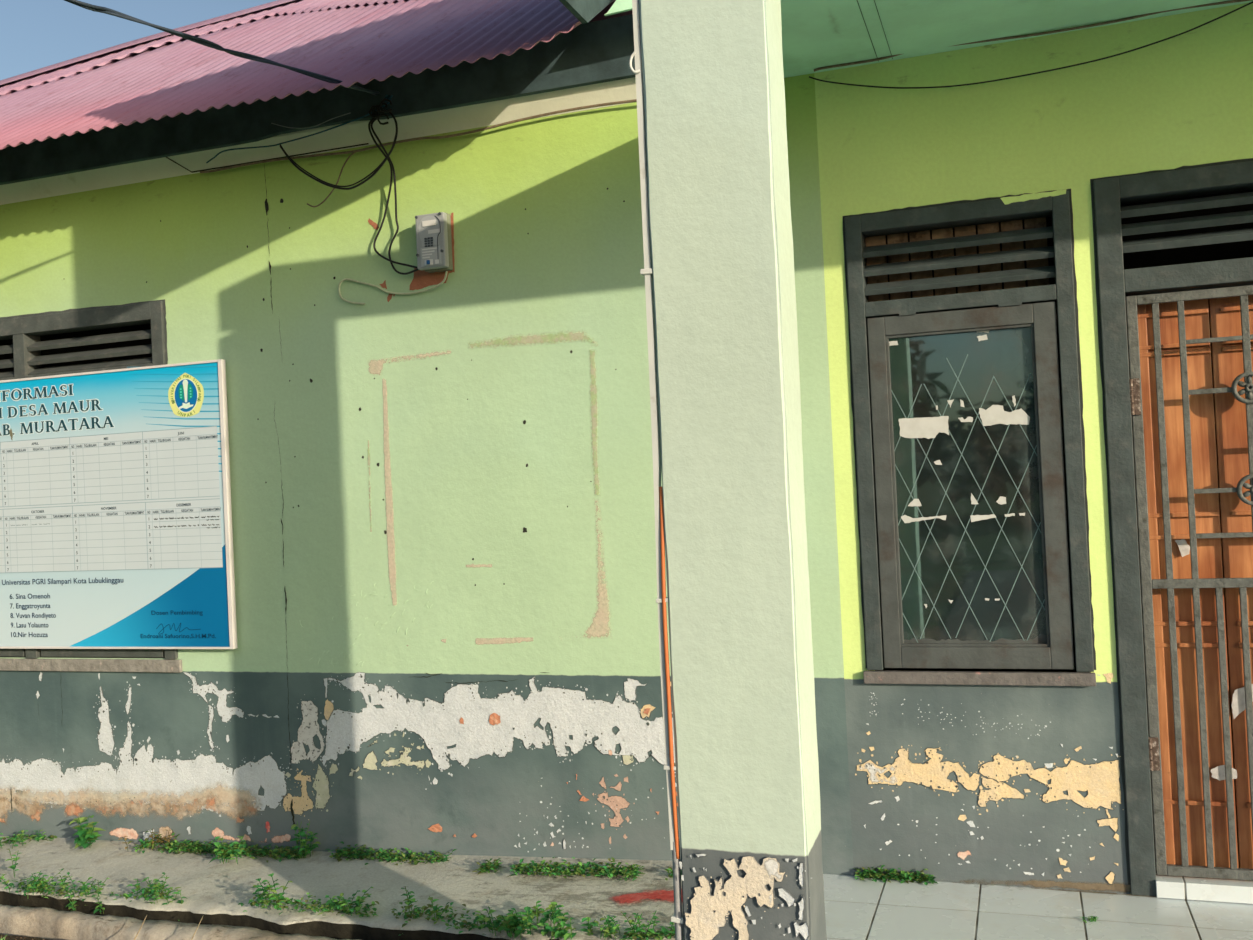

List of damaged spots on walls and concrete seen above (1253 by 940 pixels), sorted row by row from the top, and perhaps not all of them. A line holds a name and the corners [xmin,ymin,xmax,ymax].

crack [264,167,282,354]
peeling [0,672,678,858]
peeling [855,693,1124,879]
peeling [679,853,812,940]